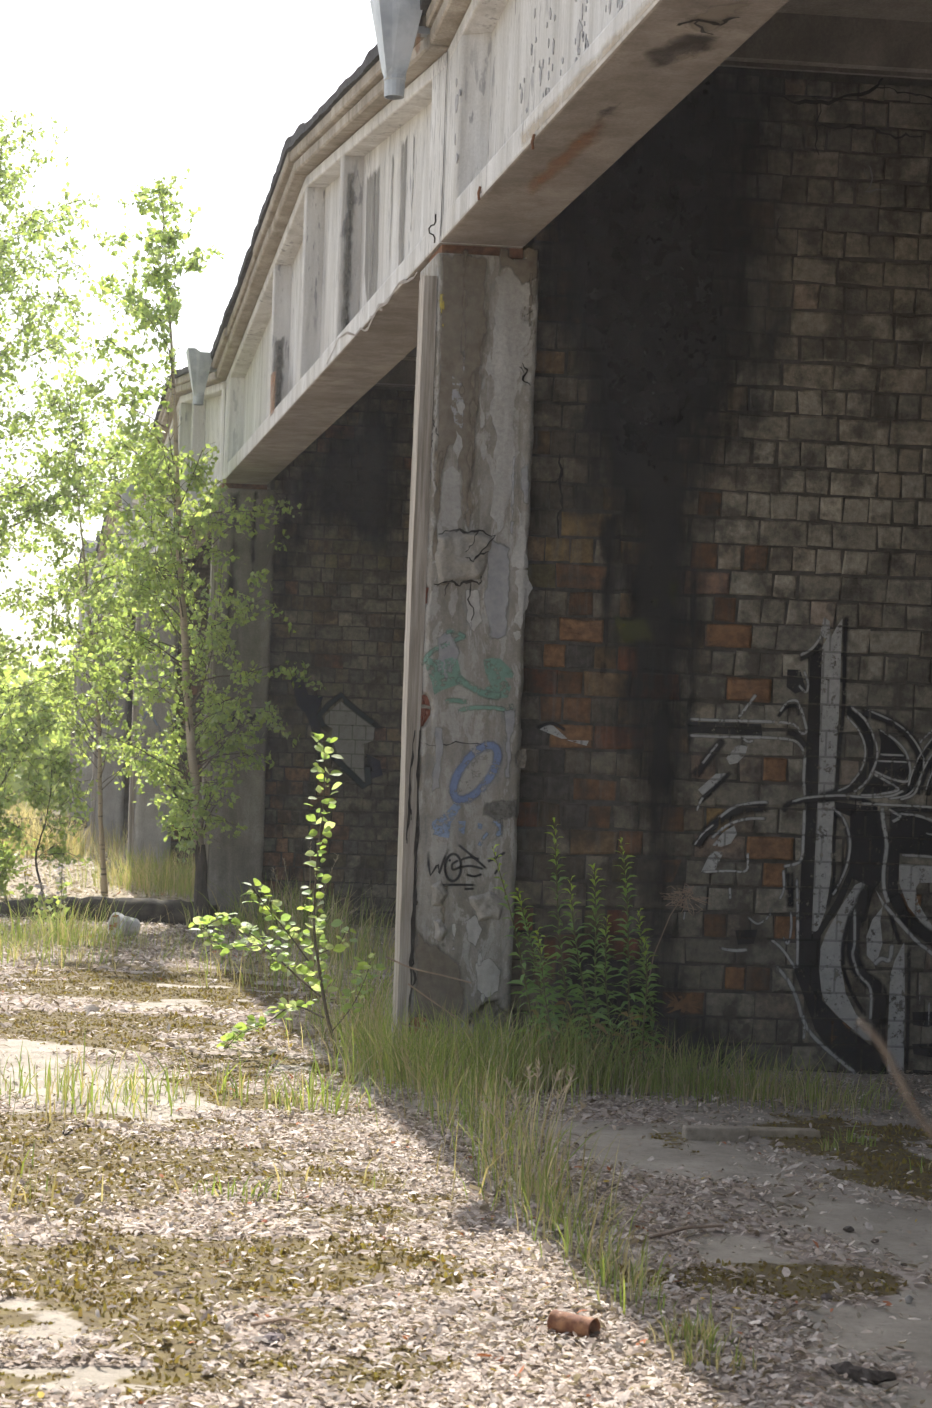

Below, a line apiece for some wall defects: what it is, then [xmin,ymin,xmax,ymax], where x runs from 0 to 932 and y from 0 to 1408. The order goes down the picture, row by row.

leakage [647,35,713,66]
crack [677,17,740,35]
peeling [430,431,463,564]
peeling [457,270,533,641]
crack [434,528,496,621]
leakage [560,445,732,1069]